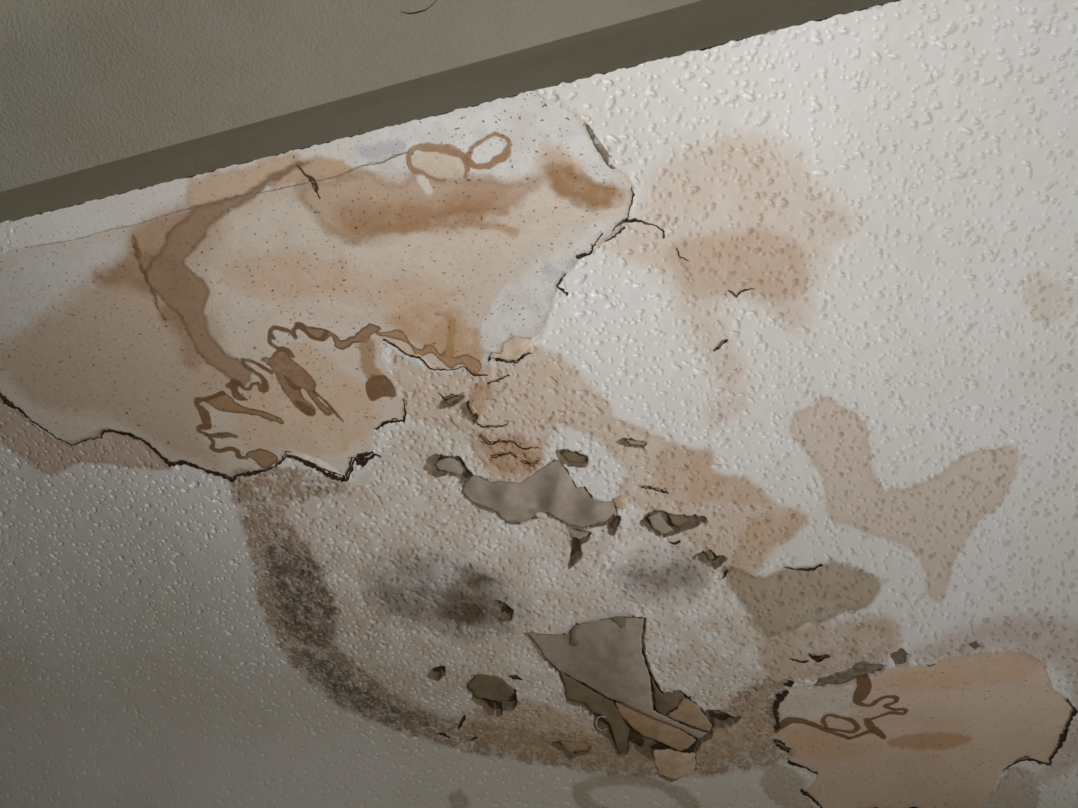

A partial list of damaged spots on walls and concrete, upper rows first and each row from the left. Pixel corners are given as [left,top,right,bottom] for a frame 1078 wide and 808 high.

peeling [0,91,633,478]
water stain [0,132,968,776]
water stain [792,398,1018,600]
peeling [776,640,1071,808]